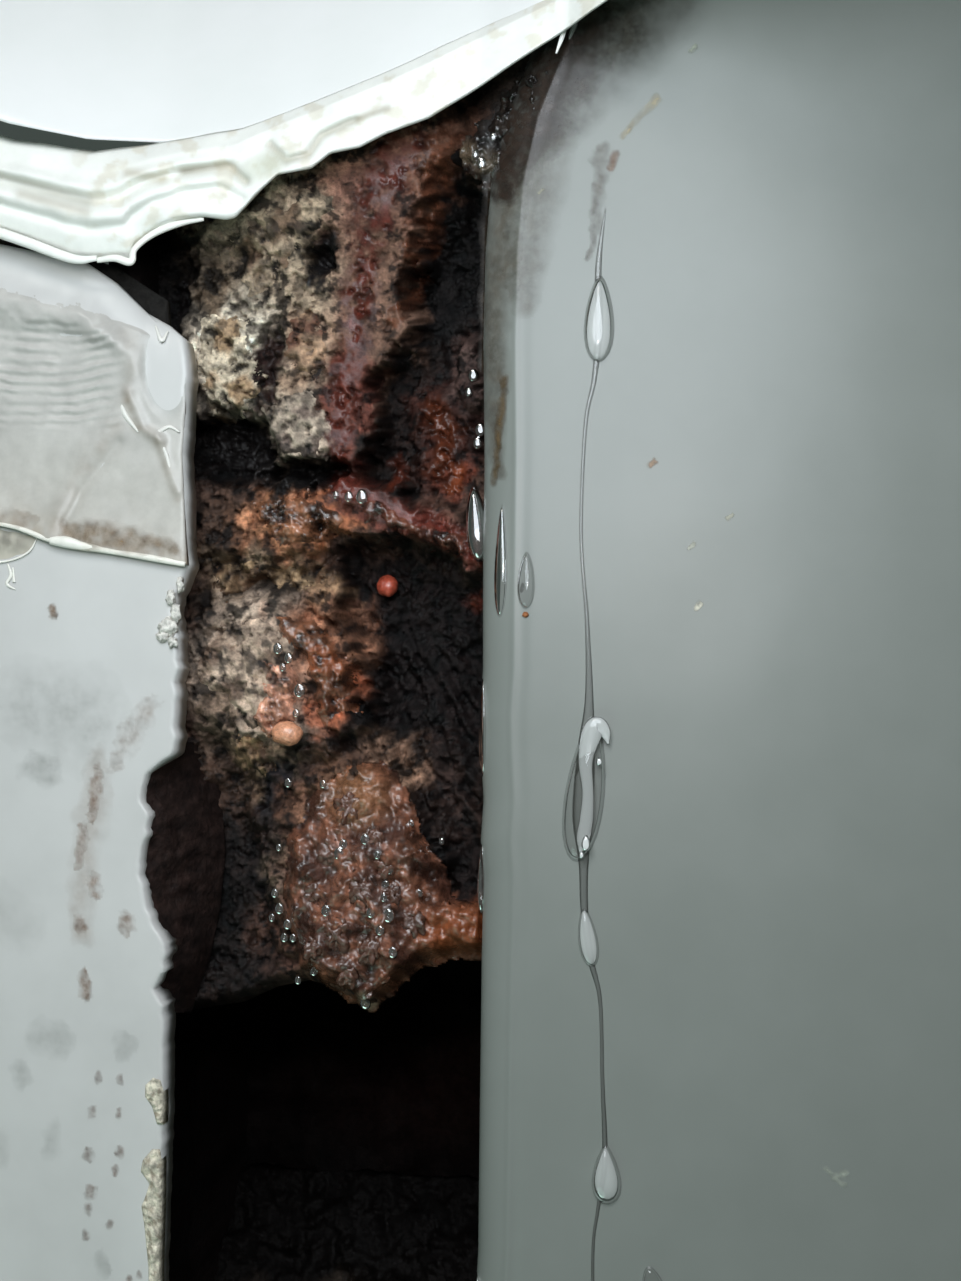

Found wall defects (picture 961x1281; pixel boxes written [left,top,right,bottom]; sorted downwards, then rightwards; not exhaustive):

water stain [492,0,650,239]
corrosion [329,125,483,565]
water stain [490,356,506,477]
spalling [0,69,513,1013]
spalling [141,1149,167,1281]
spalling [145,1078,169,1125]